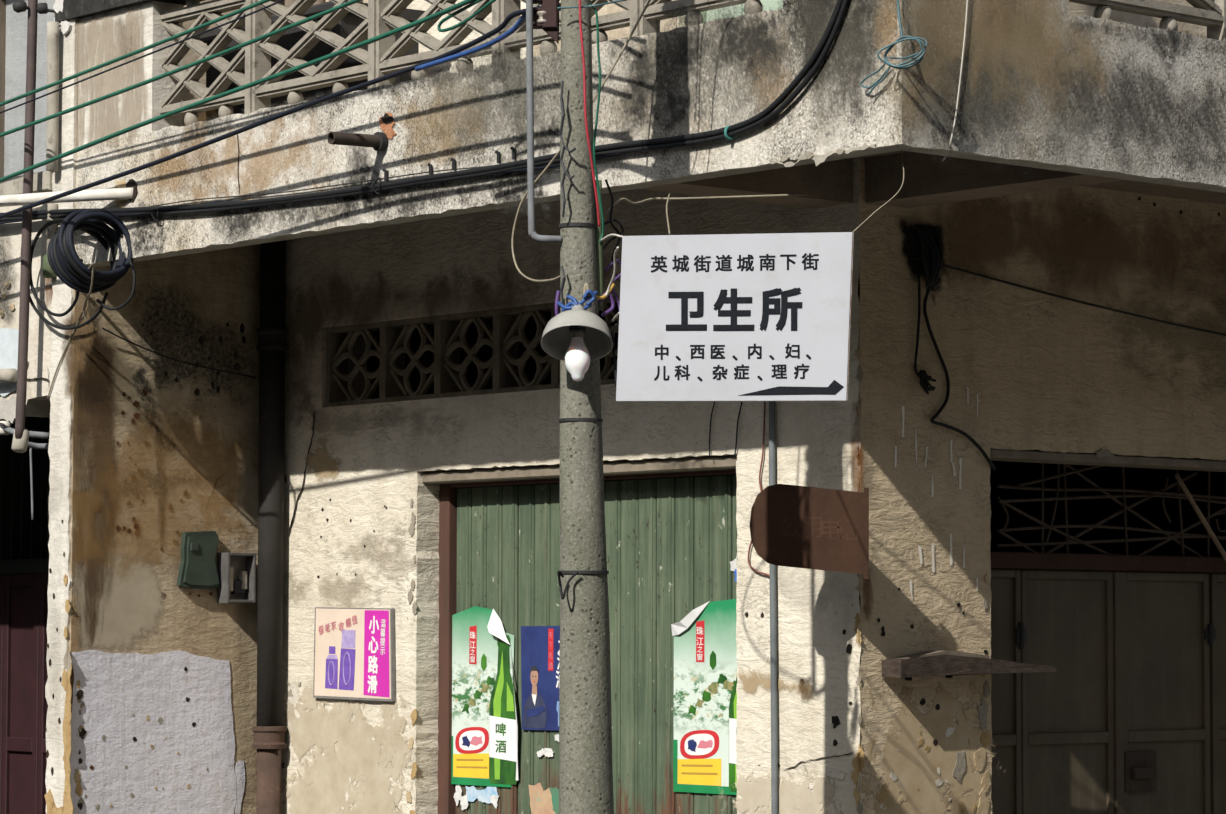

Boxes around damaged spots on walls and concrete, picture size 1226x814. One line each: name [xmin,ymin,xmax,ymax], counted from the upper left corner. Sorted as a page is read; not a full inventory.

water stain [622,0,883,133]
water stain [1061,22,1226,172]
water stain [73,324,119,643]
water stain [134,285,250,538]
crack [288,413,315,536]
flaking render [44,568,112,814]
flaking render [733,763,842,814]
flaking render [851,674,995,814]